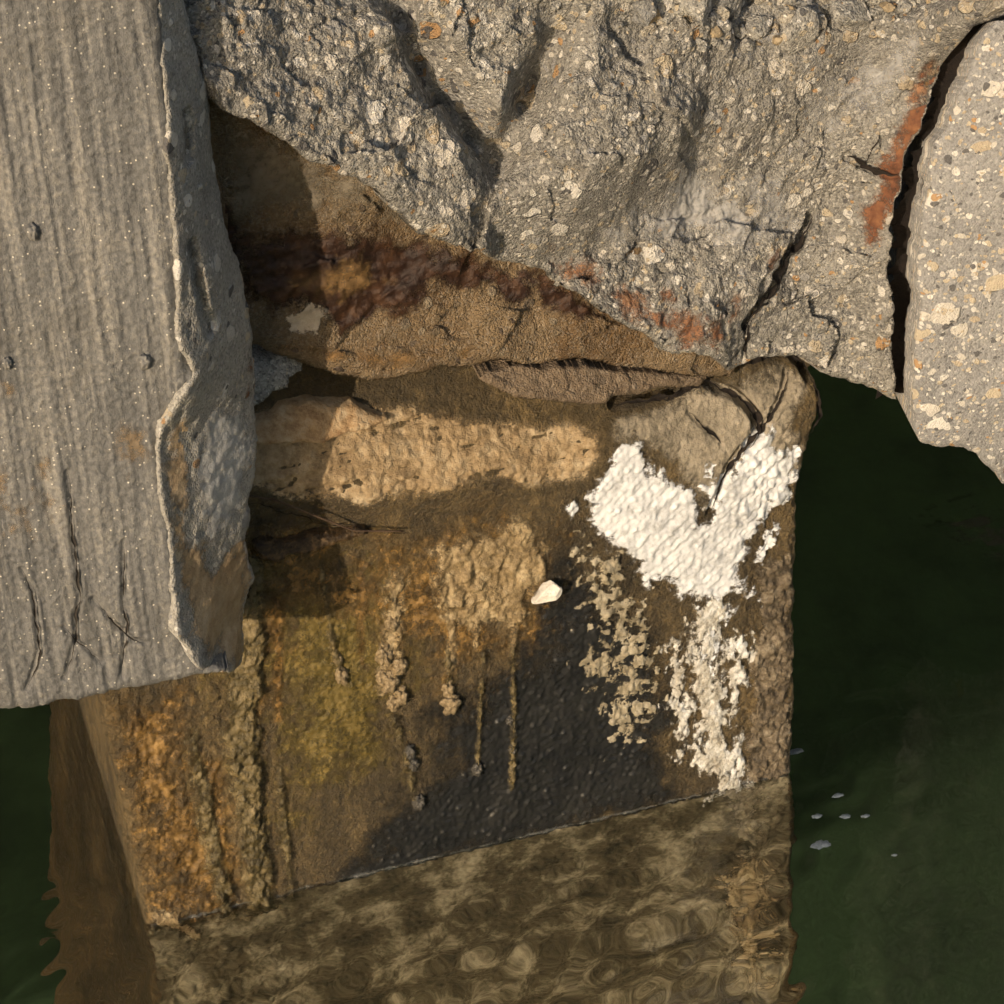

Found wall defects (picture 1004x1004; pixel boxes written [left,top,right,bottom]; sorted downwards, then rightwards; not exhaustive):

spalling [155,0,736,673]
corrosion [612,290,740,349]
crack [742,215,813,360]
corrosion [859,62,939,245]
crack [848,22,986,399]
crack [24,573,42,678]
crack [64,474,141,679]